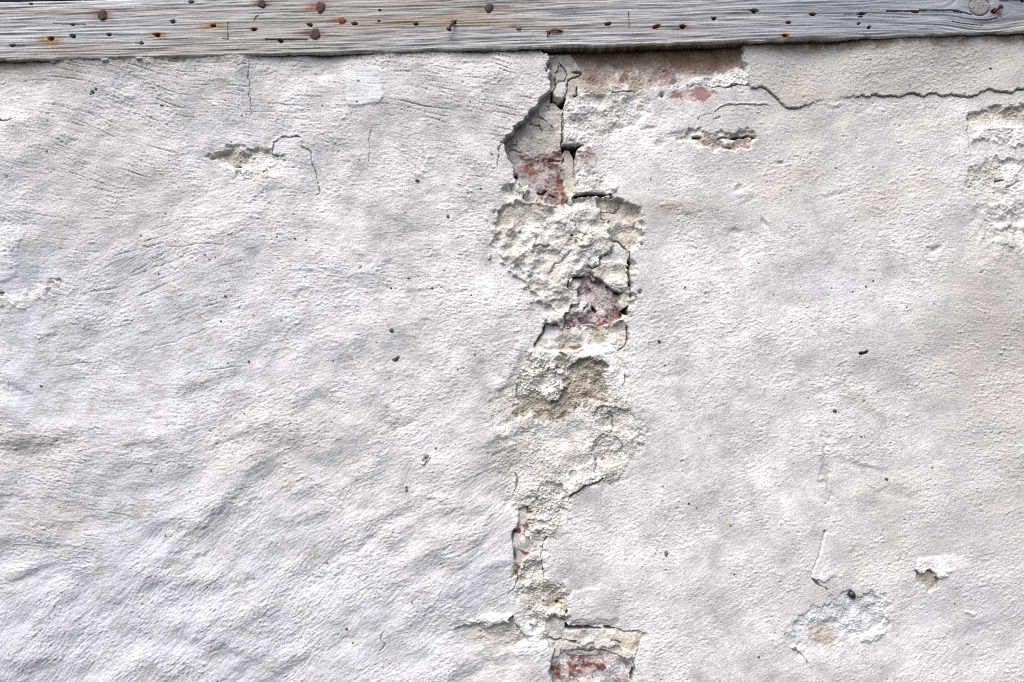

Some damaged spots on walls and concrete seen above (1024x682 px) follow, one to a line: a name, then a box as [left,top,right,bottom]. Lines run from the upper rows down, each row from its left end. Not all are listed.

crack [714,87,807,113]
crack [856,89,1024,99]
flaking render [207,145,287,184]
flaking render [486,45,757,682]
flaking render [914,555,957,593]
flaking render [469,614,514,628]
flaking render [785,590,892,668]